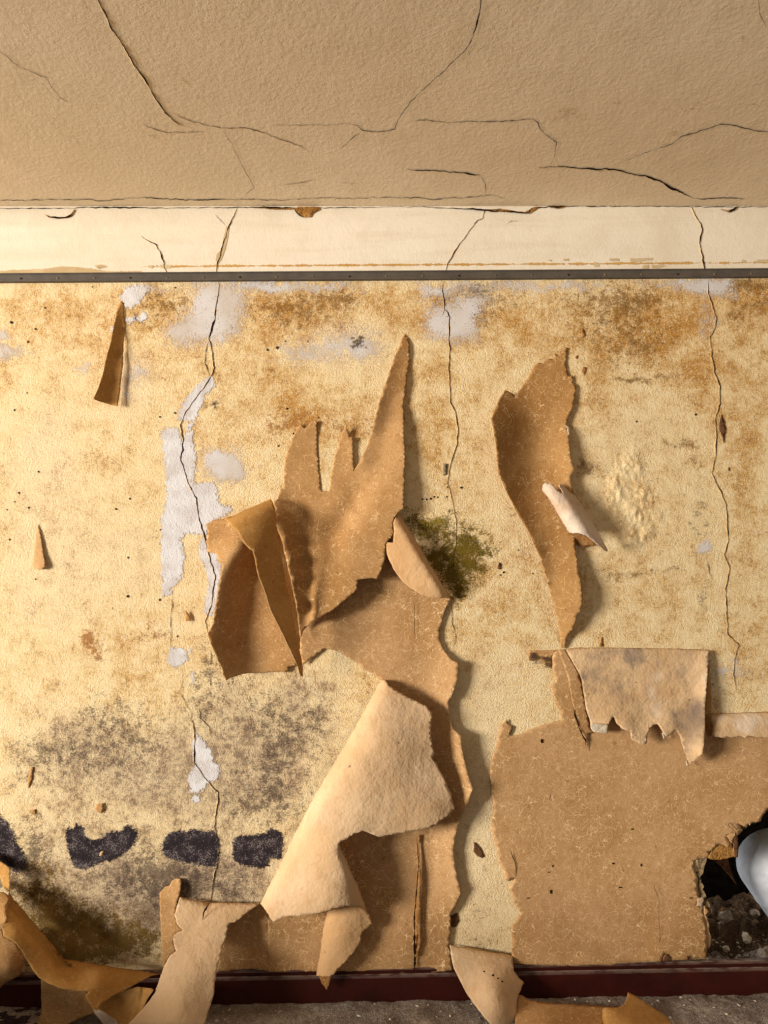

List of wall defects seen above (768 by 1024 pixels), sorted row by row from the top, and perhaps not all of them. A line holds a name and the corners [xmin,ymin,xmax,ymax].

crack [0,0,768,688]
mould [404,507,499,607]
mould [26,700,147,777]
crack [179,673,219,902]
mould [224,692,326,822]
mould [0,833,240,965]
hole [700,811,768,901]